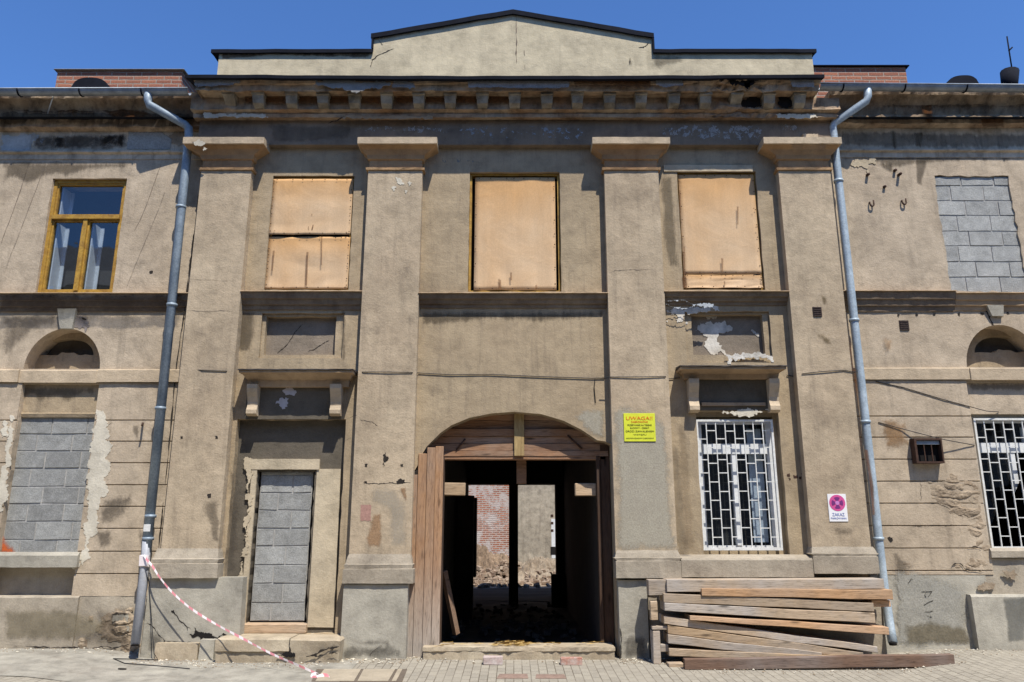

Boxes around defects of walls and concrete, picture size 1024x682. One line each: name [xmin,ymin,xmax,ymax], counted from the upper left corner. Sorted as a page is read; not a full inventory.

flaking render [341,114,583,140]
peeling [662,124,762,140]
flaking render [666,300,774,364]
peeling [275,388,297,409]
flaking render [721,407,768,418]
flaking render [239,457,254,576]
flaking render [925,473,1018,591]
flaking render [78,607,141,652]